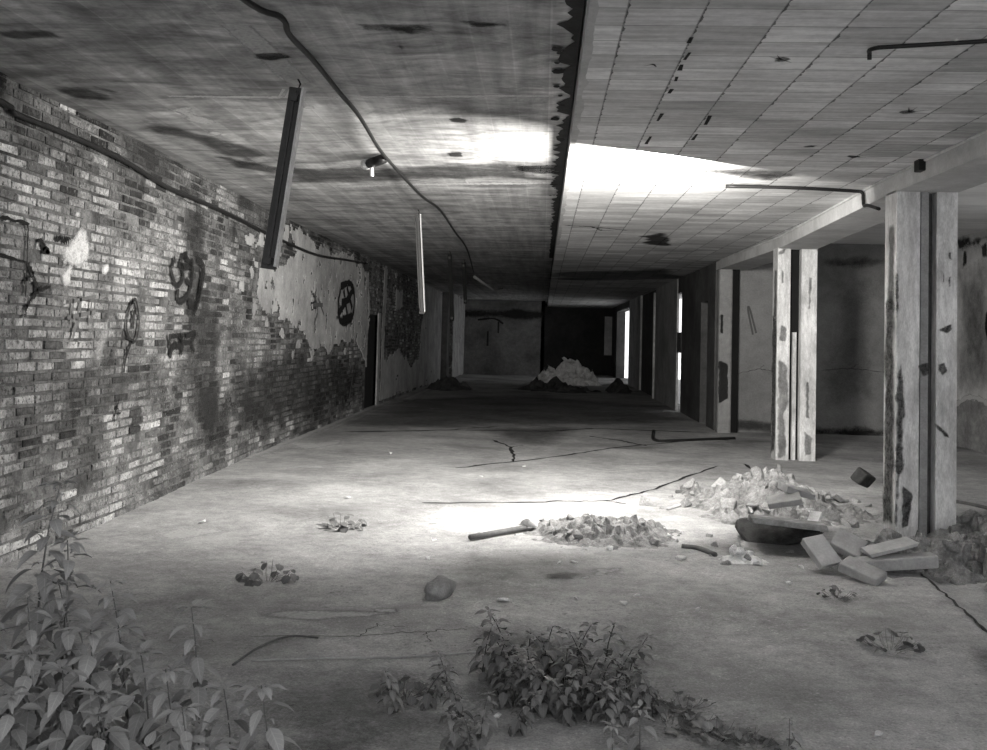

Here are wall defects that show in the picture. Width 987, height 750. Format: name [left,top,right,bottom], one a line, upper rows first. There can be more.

spalling [549,0,599,258]
flaking render [239,224,370,367]
flaking render [379,265,465,401]